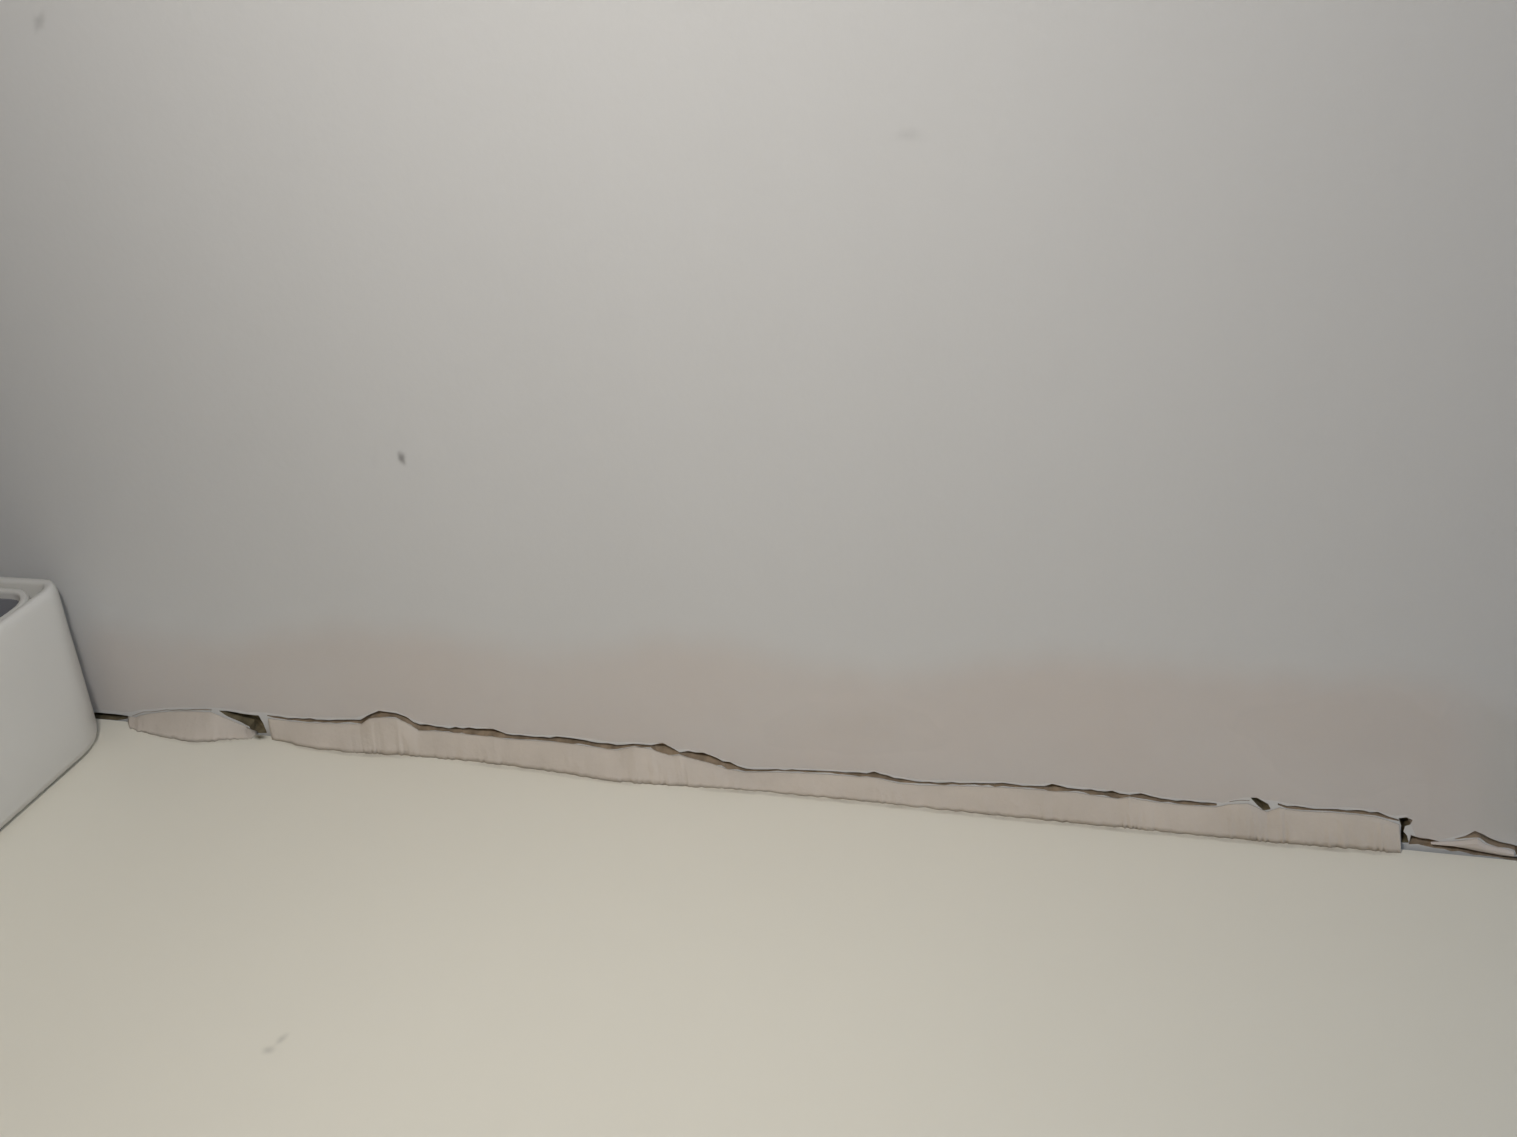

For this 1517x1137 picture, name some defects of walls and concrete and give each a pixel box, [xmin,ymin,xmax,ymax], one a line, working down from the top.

spalling [220,711,267,739]
crack [267,711,1517,861]
peeling [1251,798,1270,810]